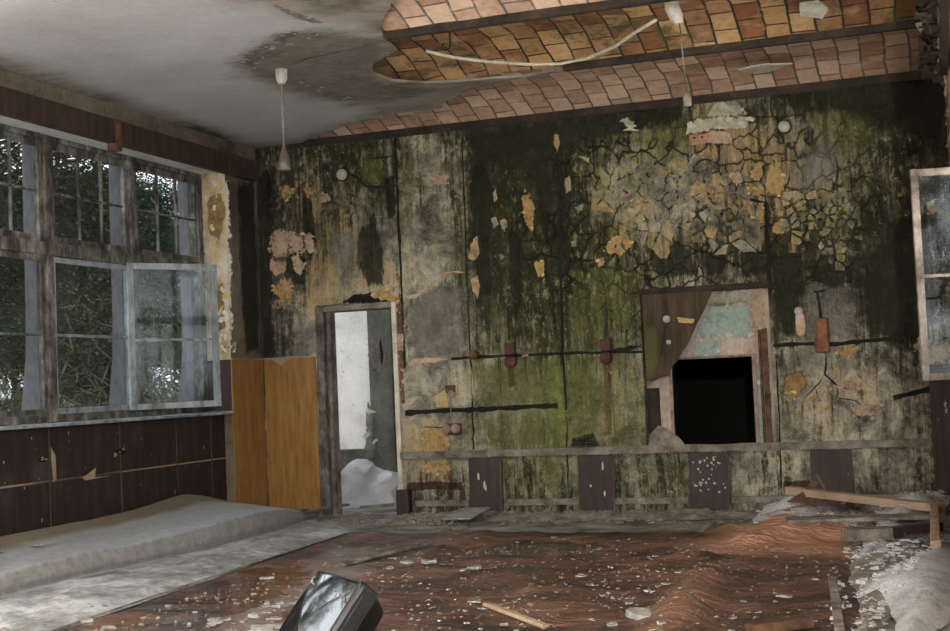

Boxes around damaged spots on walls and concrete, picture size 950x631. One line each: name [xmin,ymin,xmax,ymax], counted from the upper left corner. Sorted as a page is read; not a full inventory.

peeling [232,5,323,69]
peeling [202,180,236,353]
leakage [237,169,275,357]
peeling [267,227,315,309]
leakage [285,195,317,286]
leakage [357,214,384,286]
leakage [463,106,687,296]
crack [591,153,862,285]
peeling [709,289,767,359]
leakage [647,213,937,349]
peeling [913,336,950,365]
leakage [569,434,597,447]